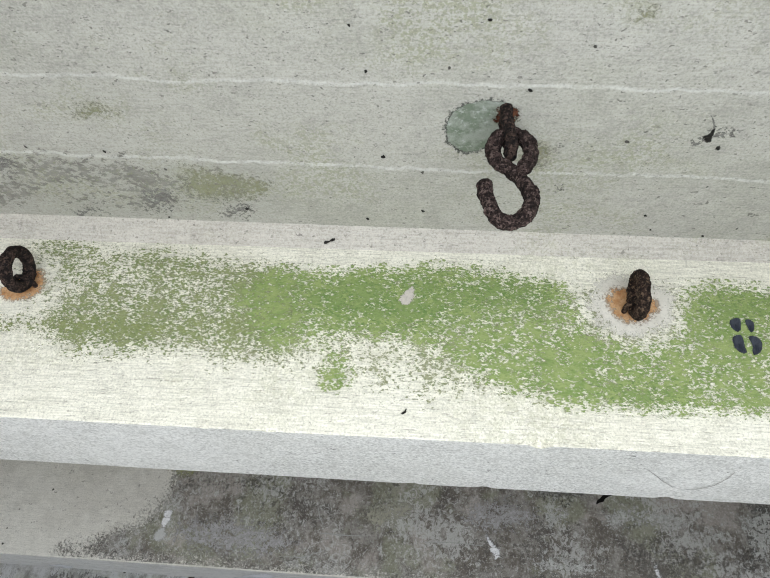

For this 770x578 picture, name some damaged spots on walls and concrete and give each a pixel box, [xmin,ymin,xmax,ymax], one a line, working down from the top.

damp [0,148,254,221]
rust [0,268,46,302]
damp [587,272,675,338]
rust [602,288,661,325]
damp [51,470,770,578]
crack [596,495,612,504]